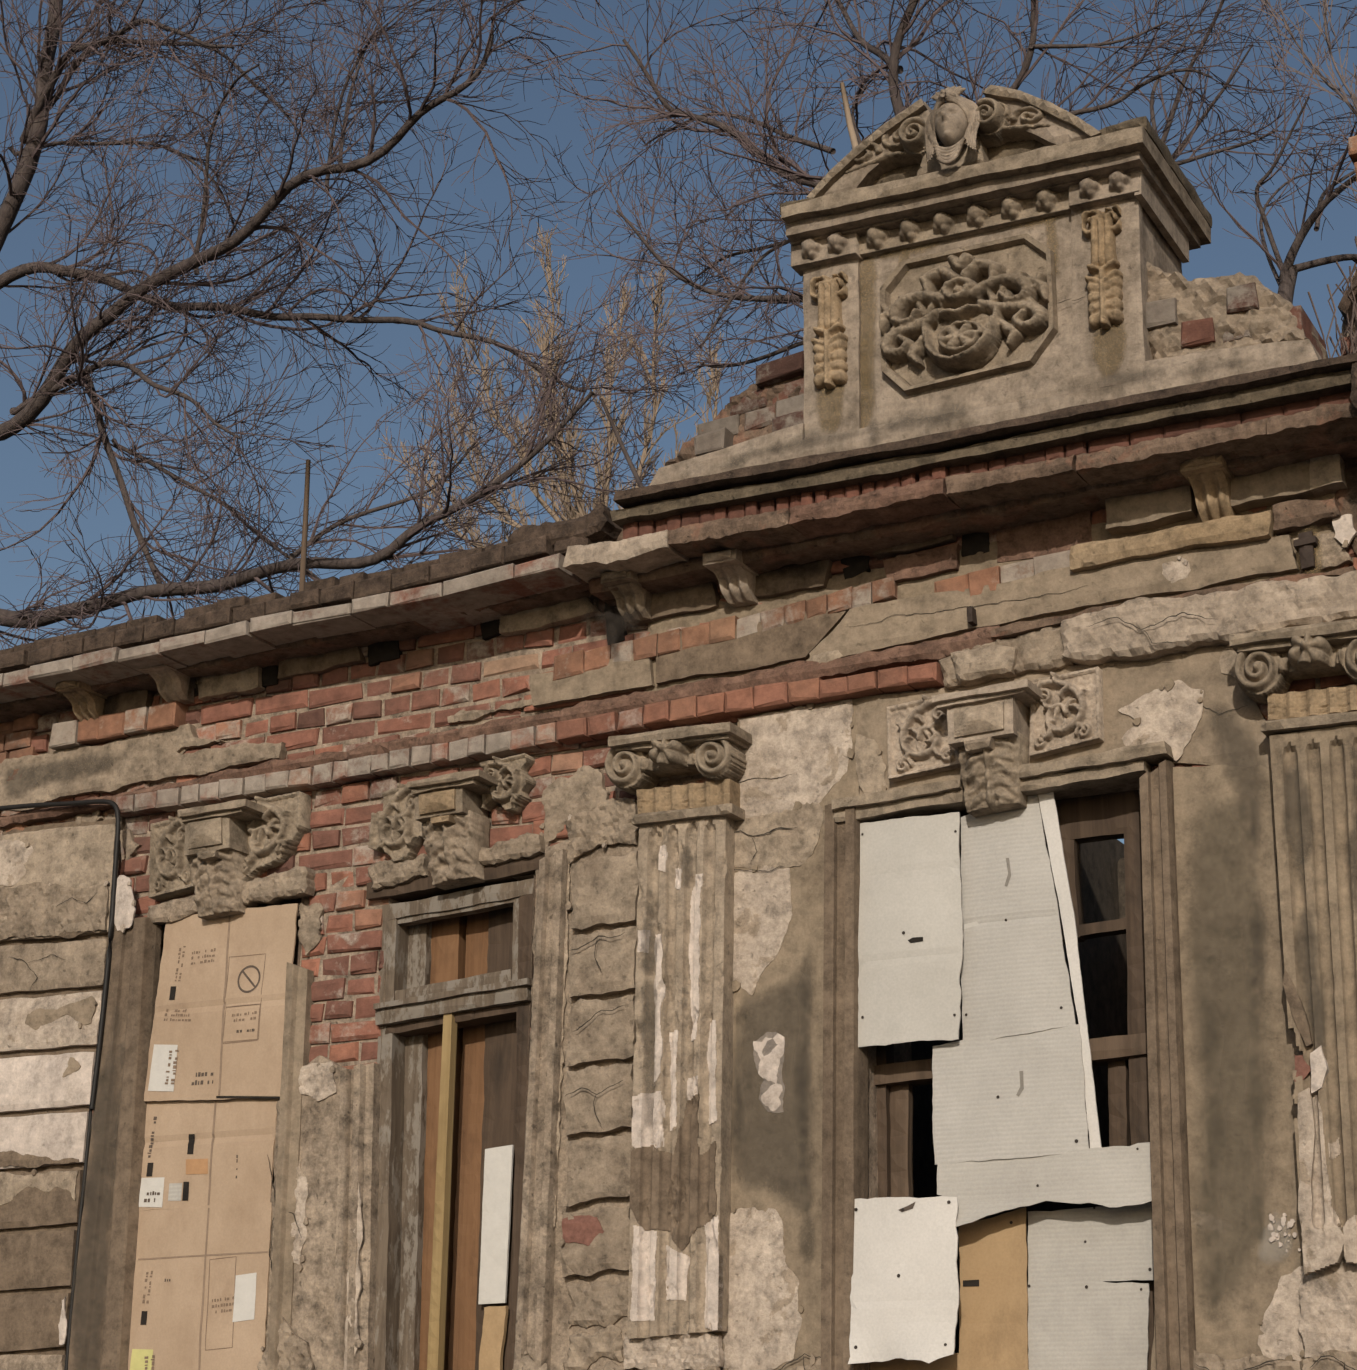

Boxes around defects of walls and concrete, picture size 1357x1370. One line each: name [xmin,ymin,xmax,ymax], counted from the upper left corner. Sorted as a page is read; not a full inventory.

spalling [1146,261,1328,360]
flaking render [553,798,639,1159]
peeling [611,845,821,1370]
flaking render [732,699,887,995]
flaking render [1118,678,1204,761]
flaking render [1193,970,1357,1370]
flaking render [257,1317,315,1370]